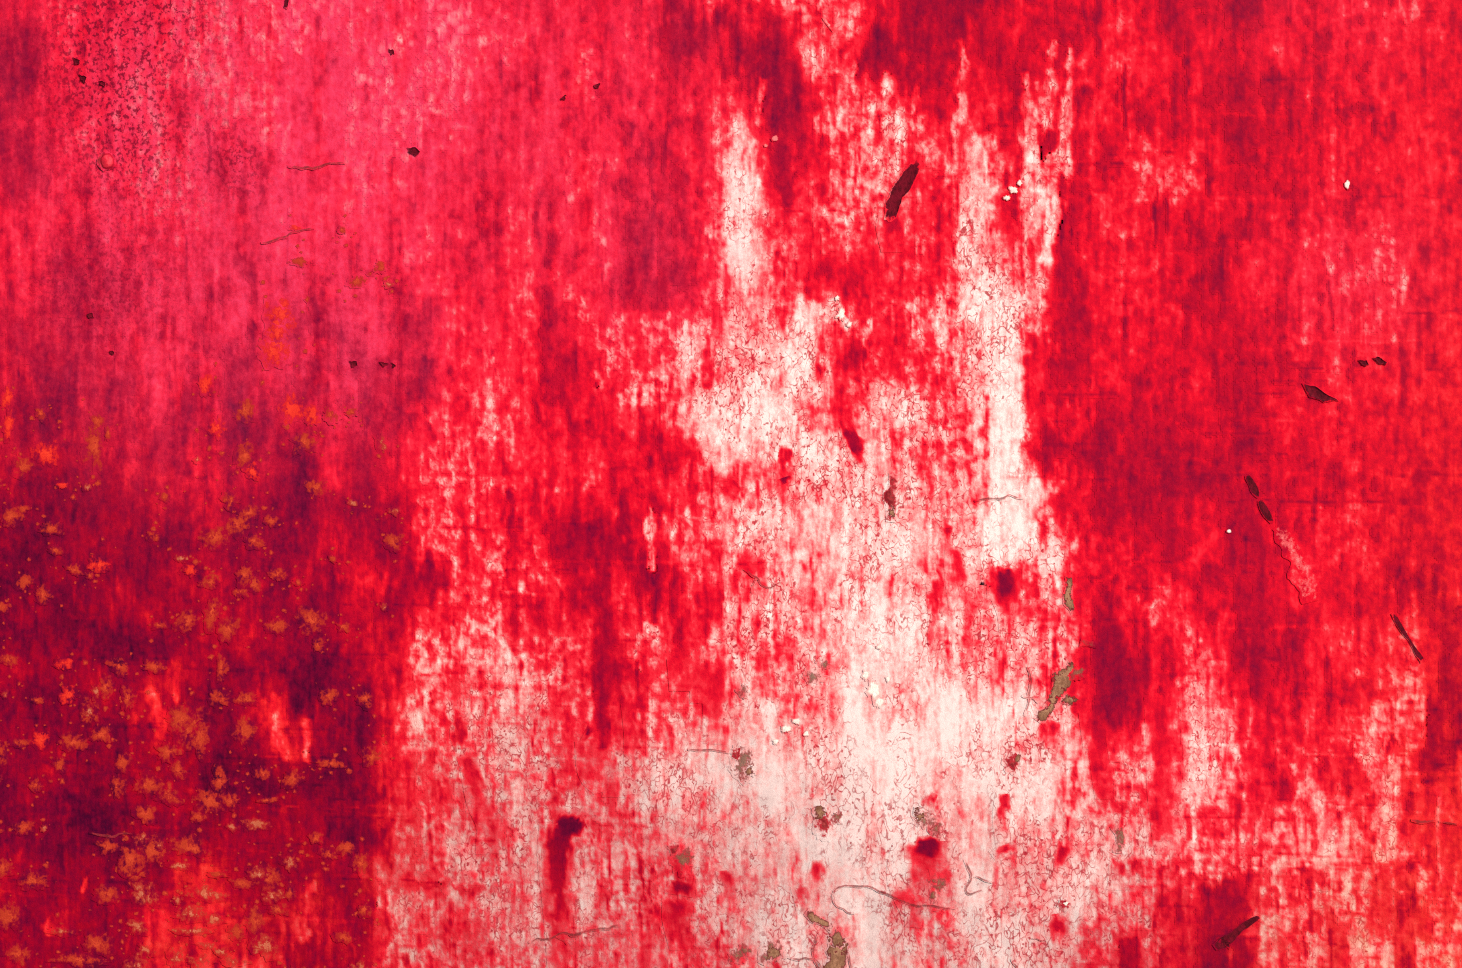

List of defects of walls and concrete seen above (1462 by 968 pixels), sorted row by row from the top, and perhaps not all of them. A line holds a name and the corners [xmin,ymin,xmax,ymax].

peeling [81,0,527,248]
rust [0,279,409,968]
peeling [376,0,1462,968]